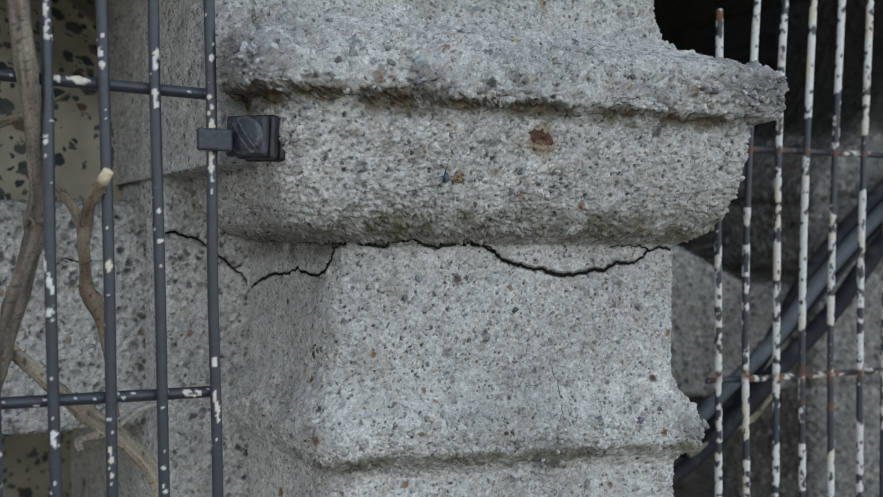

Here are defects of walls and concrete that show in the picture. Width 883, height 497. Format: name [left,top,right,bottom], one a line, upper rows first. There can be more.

corrosion [530,129,553,151]
crack [164,231,670,289]